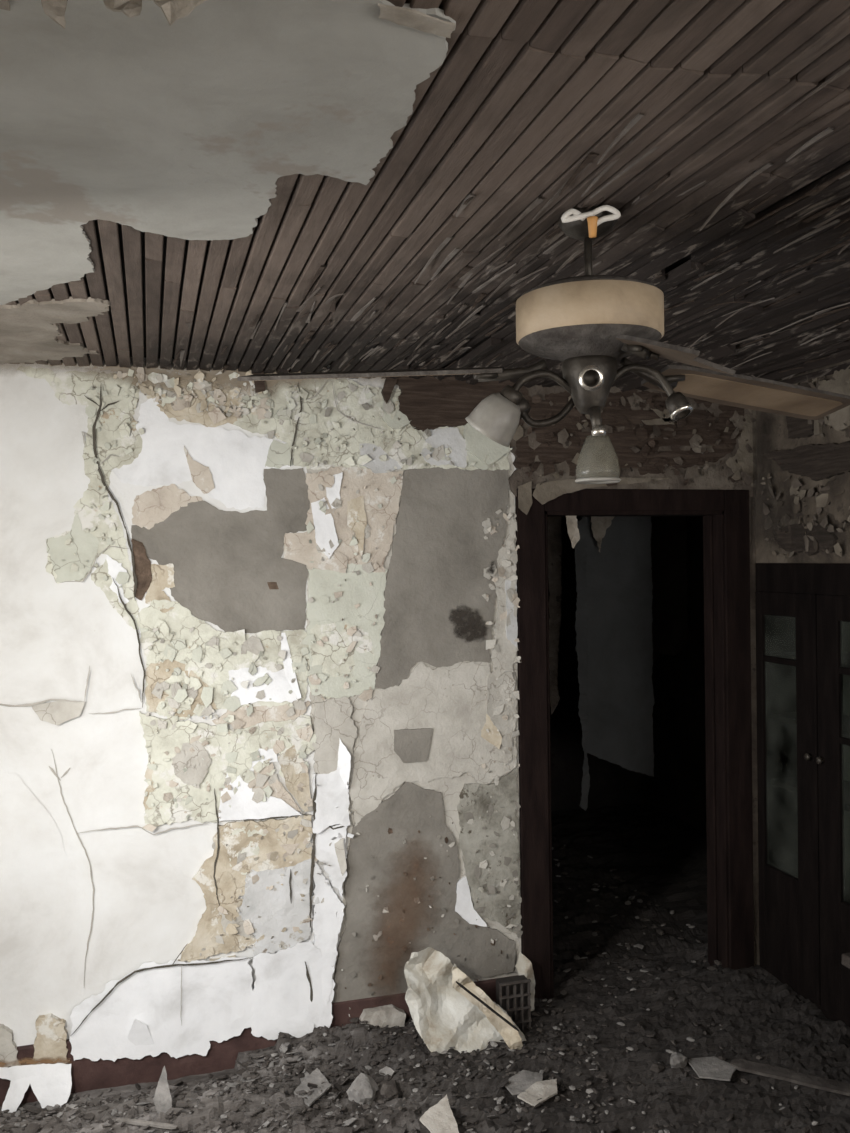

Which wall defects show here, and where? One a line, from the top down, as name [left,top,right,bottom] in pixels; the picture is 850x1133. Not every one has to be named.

peeling [103,0,206,26]
crack [0,387,145,714]
water stain [449,607,487,642]
flaking render [0,364,850,1113]
crack [49,749,345,978]
crack [72,943,248,1035]
crack [305,962,313,1002]